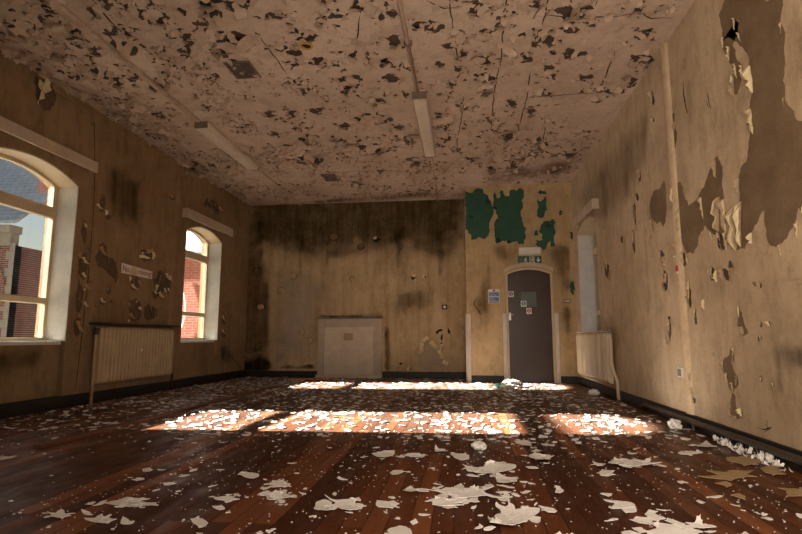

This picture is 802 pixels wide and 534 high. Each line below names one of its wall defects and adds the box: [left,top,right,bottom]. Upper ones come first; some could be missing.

peeling [621,0,802,292]
peeling [684,280,705,324]
peeling [737,305,748,336]